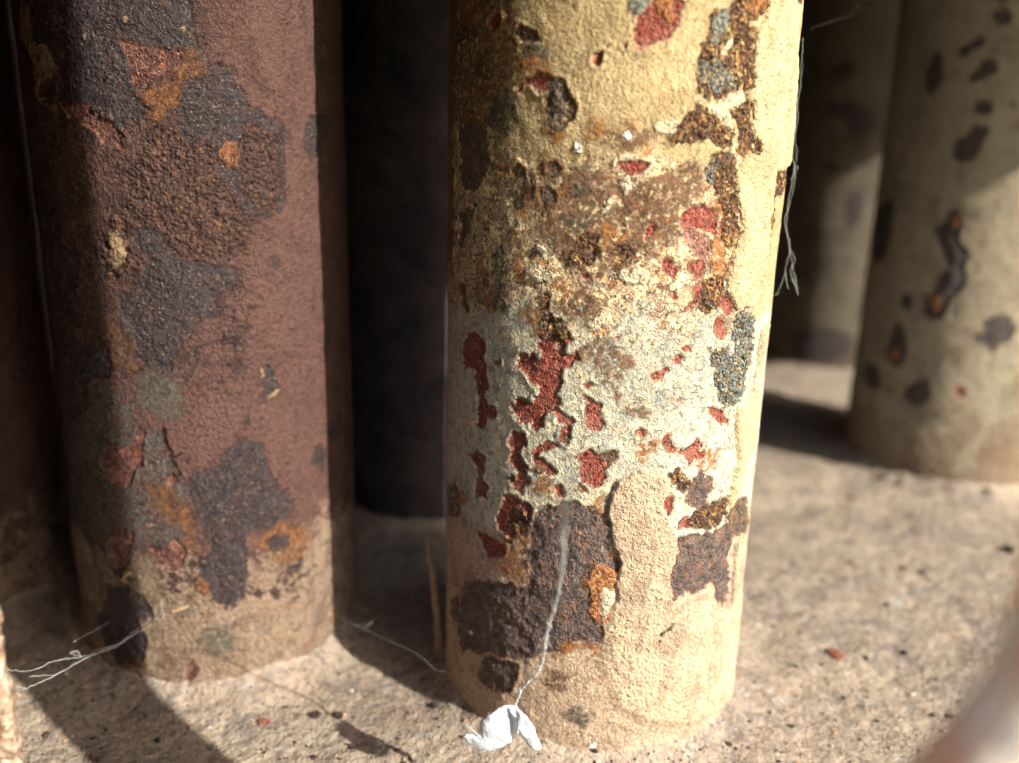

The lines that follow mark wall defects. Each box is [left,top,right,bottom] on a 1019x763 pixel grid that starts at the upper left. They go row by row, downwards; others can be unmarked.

peeling [622,0,687,52]
peeling [693,89,744,157]
rust [28,0,329,375]
rust [521,278,575,342]
rust [568,222,636,270]
peeling [661,203,737,312]
rust [901,209,971,320]
rust [145,437,312,606]
peeling [462,331,605,558]
peeling [574,448,619,493]
peeling [663,492,692,530]
rust [0,608,25,763]